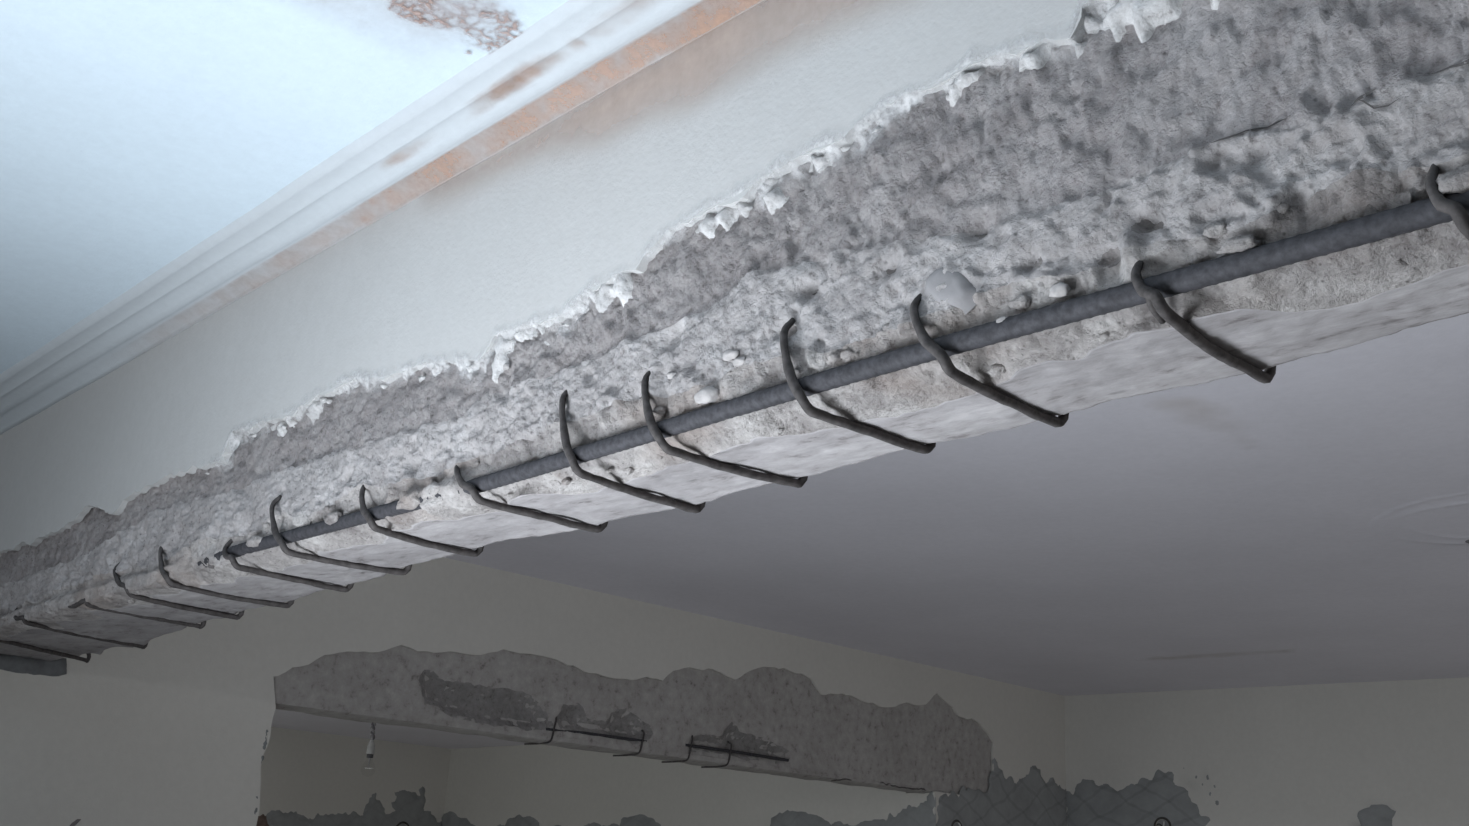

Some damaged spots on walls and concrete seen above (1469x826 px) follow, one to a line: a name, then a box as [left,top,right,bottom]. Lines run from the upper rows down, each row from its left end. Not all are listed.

corrosion [389,0,518,54]
spalling [0,0,1469,639]
spalling [0,654,67,676]
spalling [273,645,992,795]
flaking render [254,796,269,826]